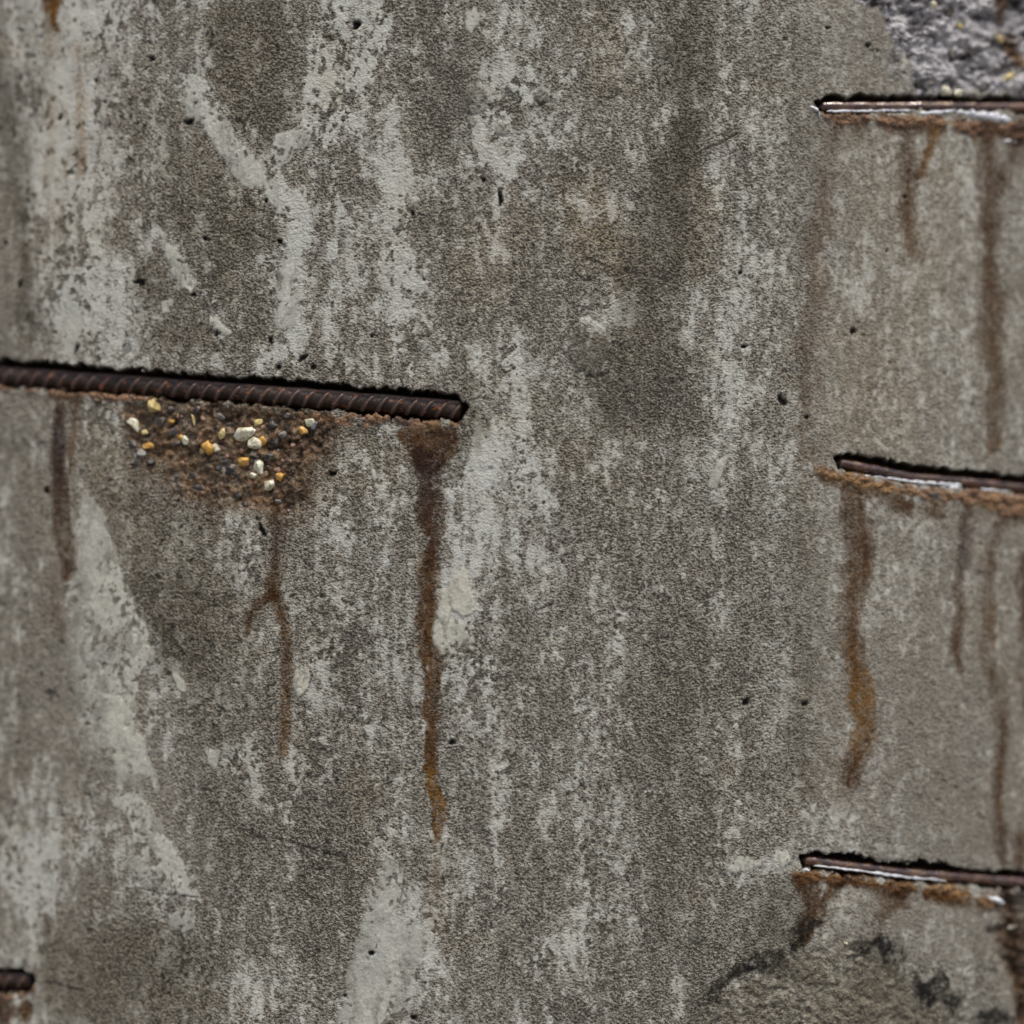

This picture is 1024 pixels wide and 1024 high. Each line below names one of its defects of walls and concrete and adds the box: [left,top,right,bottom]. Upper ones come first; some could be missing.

spalling [814,0,1024,140]
spalling [0,357,469,513]
spalling [815,453,1024,517]
rust [846,490,871,599]
rust [398,428,456,838]
peeling [727,857,763,873]
spalling [778,851,1024,909]
spalling [0,968,36,1003]